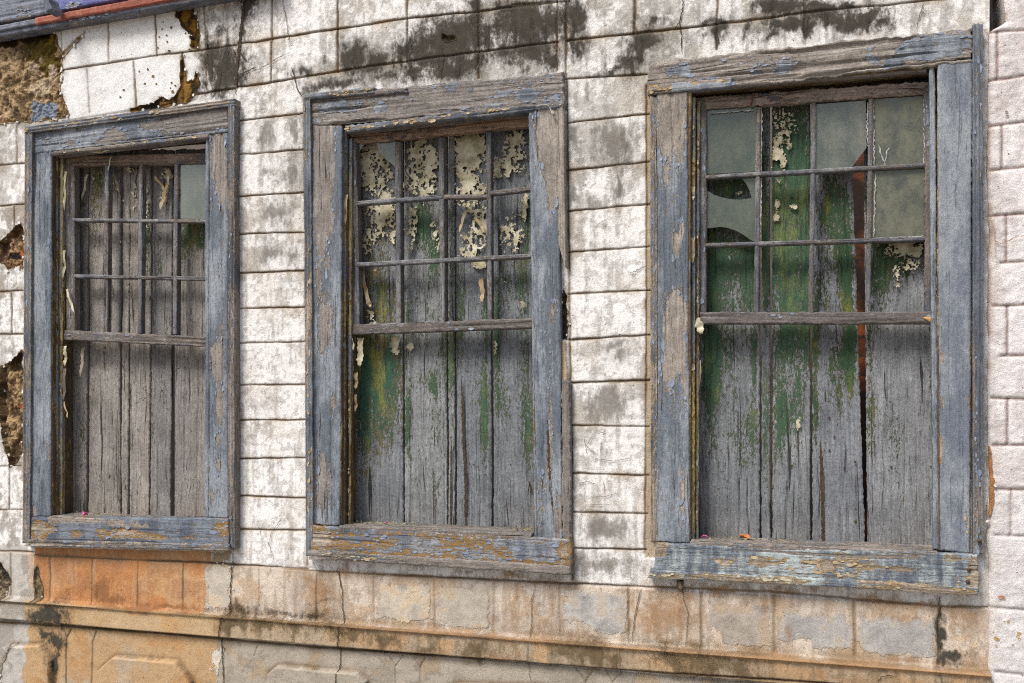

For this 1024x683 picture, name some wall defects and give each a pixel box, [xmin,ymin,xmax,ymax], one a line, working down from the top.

spalling [0,1,233,153]
water stain [287,0,590,94]
water stain [585,14,669,98]
water stain [702,16,729,45]
water stain [742,0,896,41]
water stain [594,126,630,161]
spalling [0,222,28,273]
spalling [0,349,28,467]
water stain [92,579,187,614]
water stain [27,592,70,674]
water stain [934,600,961,668]